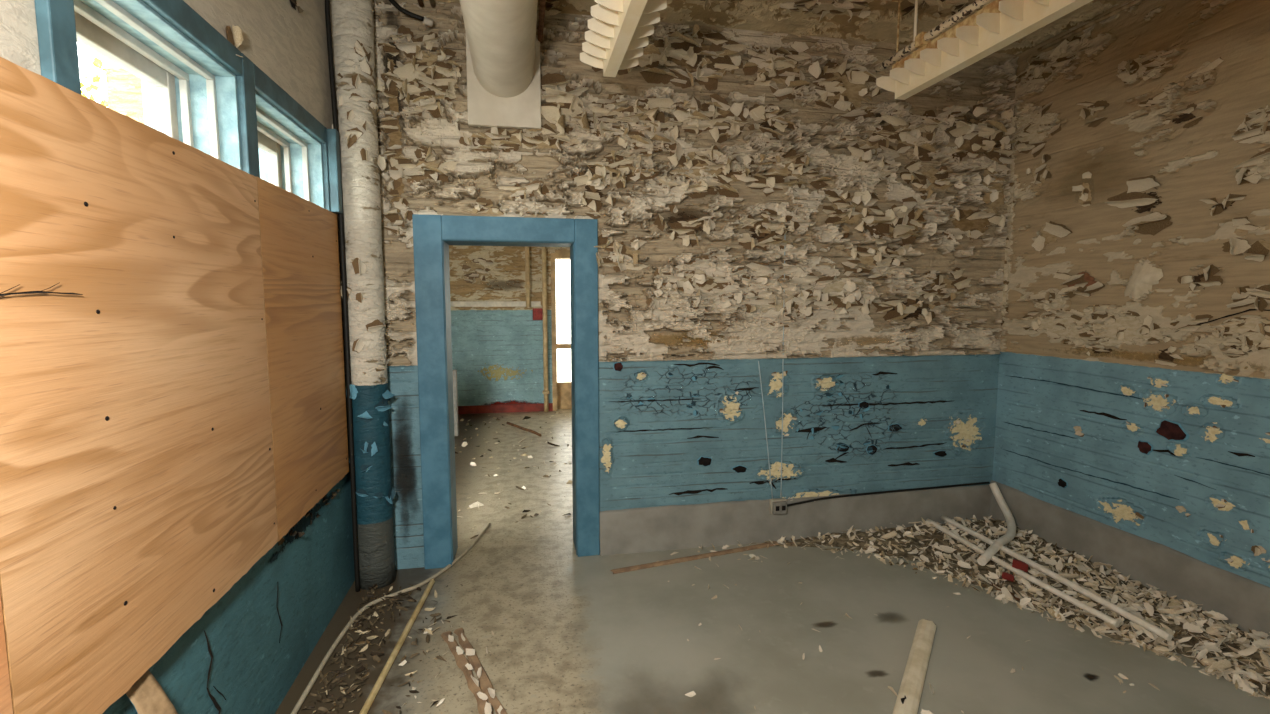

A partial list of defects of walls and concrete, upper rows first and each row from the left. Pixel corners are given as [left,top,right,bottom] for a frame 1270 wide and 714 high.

peeling [332,25,463,243]
peeling [459,24,1270,442]
crack [0,283,83,296]
crack [674,363,758,396]
crack [611,398,719,439]
crack [796,371,951,467]
damp [395,409,416,521]
crack [669,478,796,495]
peeling [757,462,802,484]
peeling [267,489,340,566]
peeling [1207,497,1270,569]
peeling [125,670,178,714]